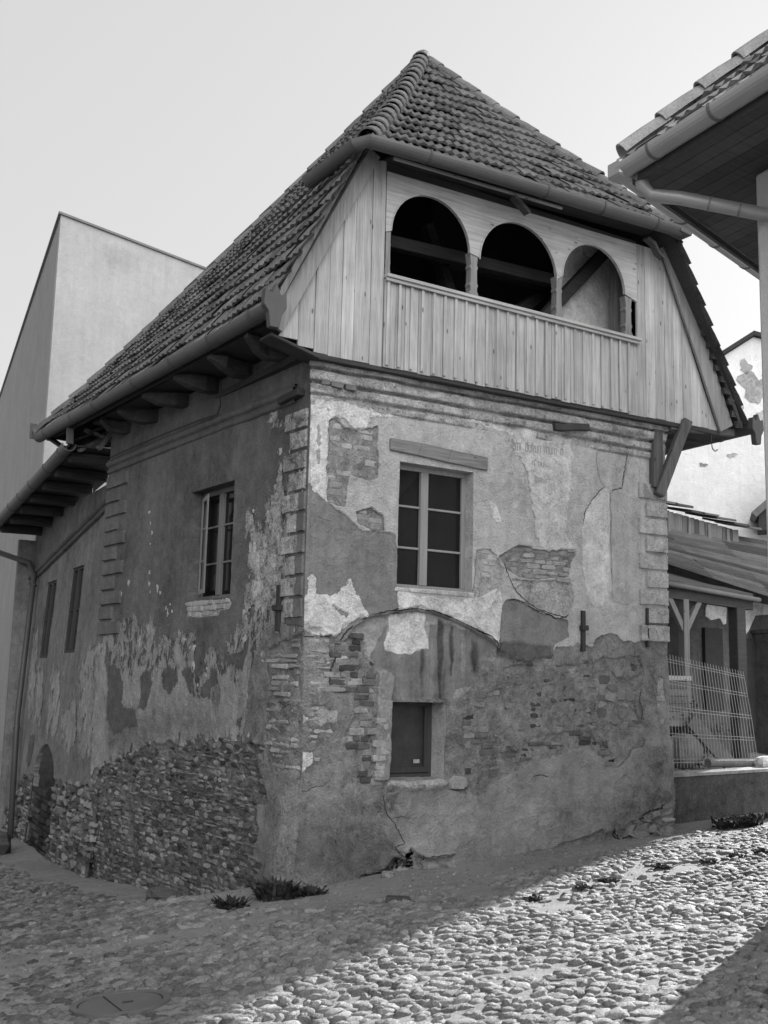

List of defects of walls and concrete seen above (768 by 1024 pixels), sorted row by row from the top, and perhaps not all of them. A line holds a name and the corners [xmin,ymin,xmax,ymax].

peeling [736,359,764,426]
crack [583,447,632,604]
spalling [27,409,675,887]
crack [359,796,453,879]